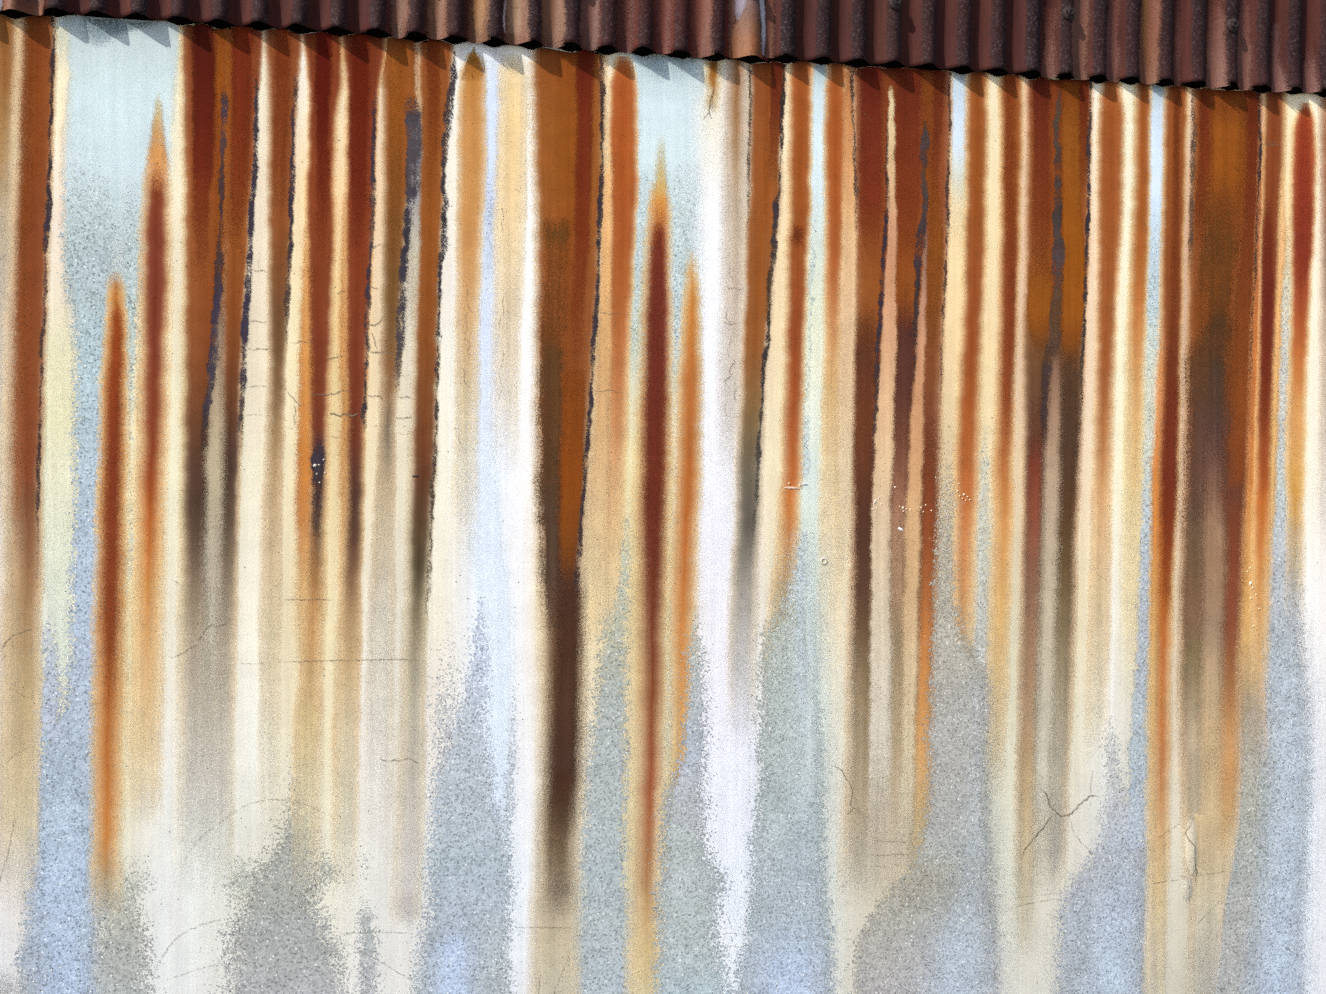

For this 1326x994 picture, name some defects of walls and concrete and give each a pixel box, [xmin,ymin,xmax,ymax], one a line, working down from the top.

rust [0,0,58,910]
rust [86,0,706,994]
rust [688,0,1326,994]
crack [1023,778,1099,856]